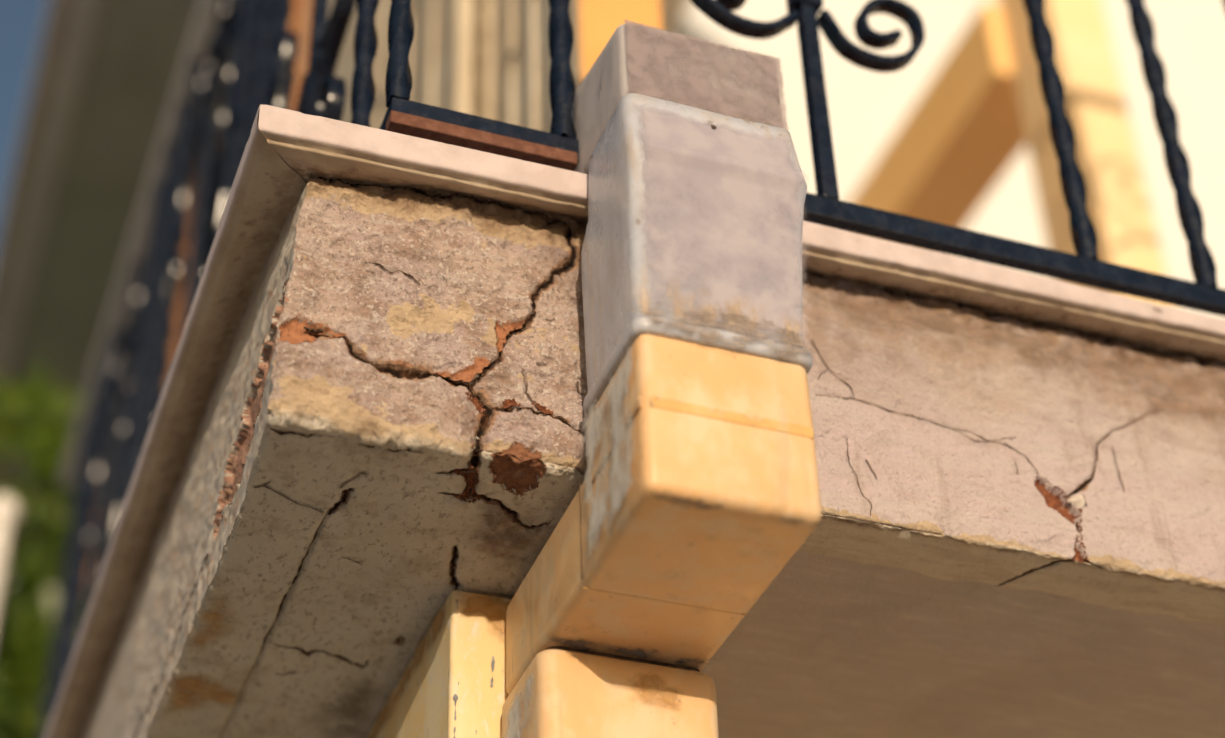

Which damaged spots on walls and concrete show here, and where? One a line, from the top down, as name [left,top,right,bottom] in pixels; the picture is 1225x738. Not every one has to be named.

spalling [213,279,346,540]
crack [220,176,586,737]
spalling [488,441,547,497]
crack [822,439,941,535]
crack [811,339,1037,475]
spalling [1034,472,1089,563]
crack [1062,410,1162,506]
crack [998,559,1102,586]